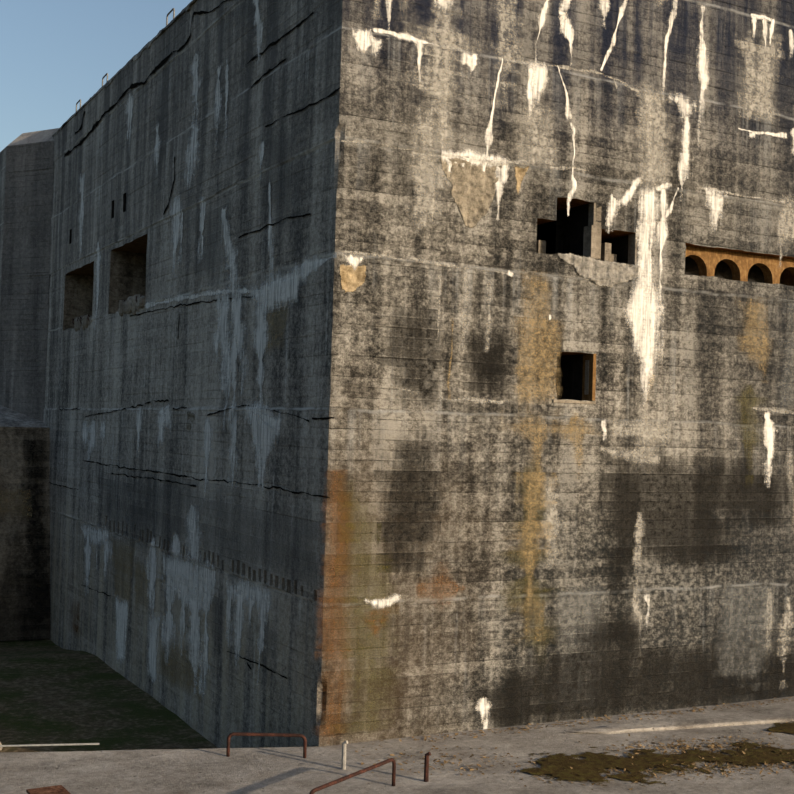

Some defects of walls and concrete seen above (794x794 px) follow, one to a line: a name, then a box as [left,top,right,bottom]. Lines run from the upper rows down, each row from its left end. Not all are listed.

crack [64,0,229,157]
crack [247,12,313,88]
leakage [412,0,508,228]
leakage [537,0,549,40]
leakage [559,0,574,52]
crack [163,157,175,215]
spalling [441,158,529,228]
leakage [607,0,709,395]
spalling [340,255,366,292]
leakage [146,182,337,492]
crack [82,460,330,498]
leakage [599,389,794,590]